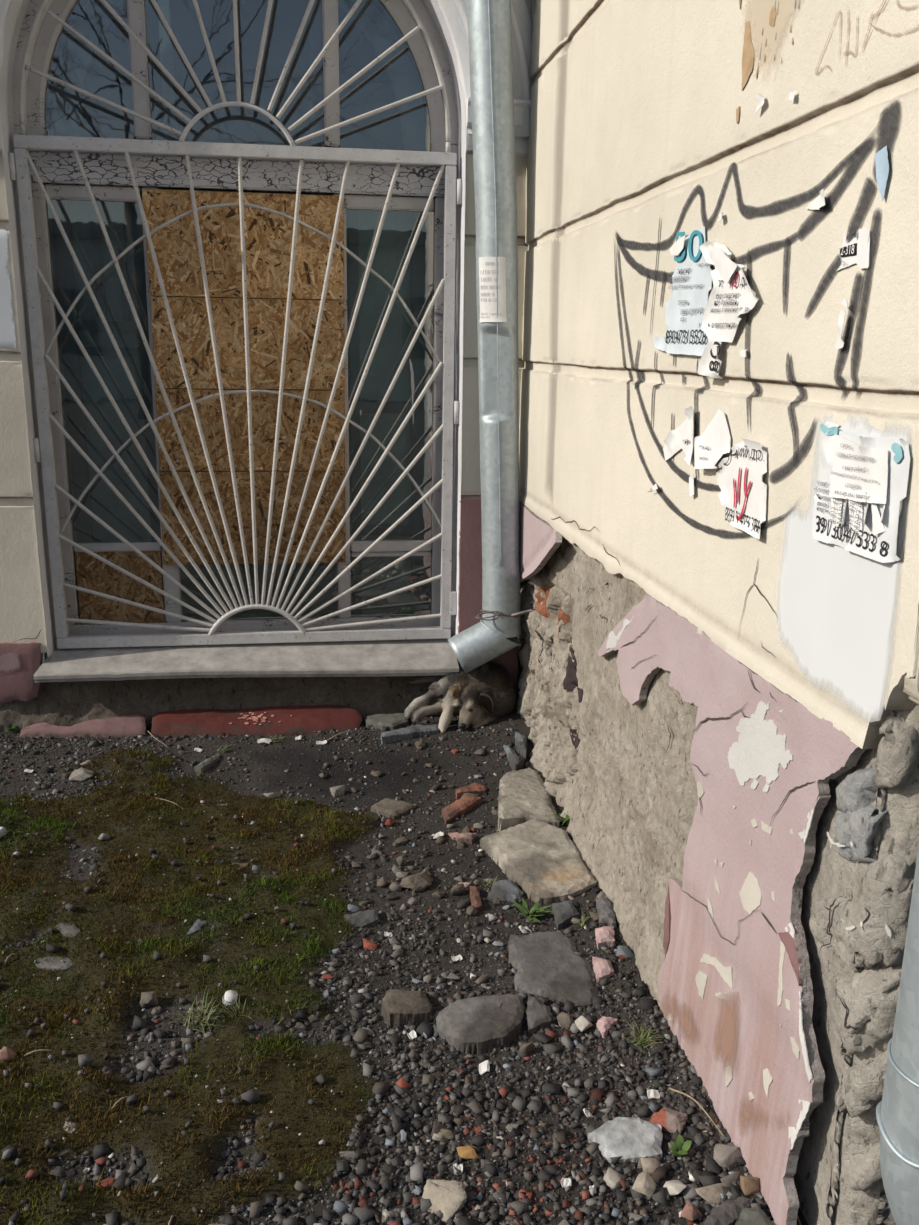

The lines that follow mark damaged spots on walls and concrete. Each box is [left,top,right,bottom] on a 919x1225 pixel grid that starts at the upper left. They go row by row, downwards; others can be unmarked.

peeling [739,0,800,91]
crack [667,561,778,749]
spalling [514,536,704,1005]
peeling [727,701,793,792]
peeling [739,872,776,914]
peeling [695,953,733,1000]
spalling [777,704,919,1225]
peeling [748,1068,773,1101]